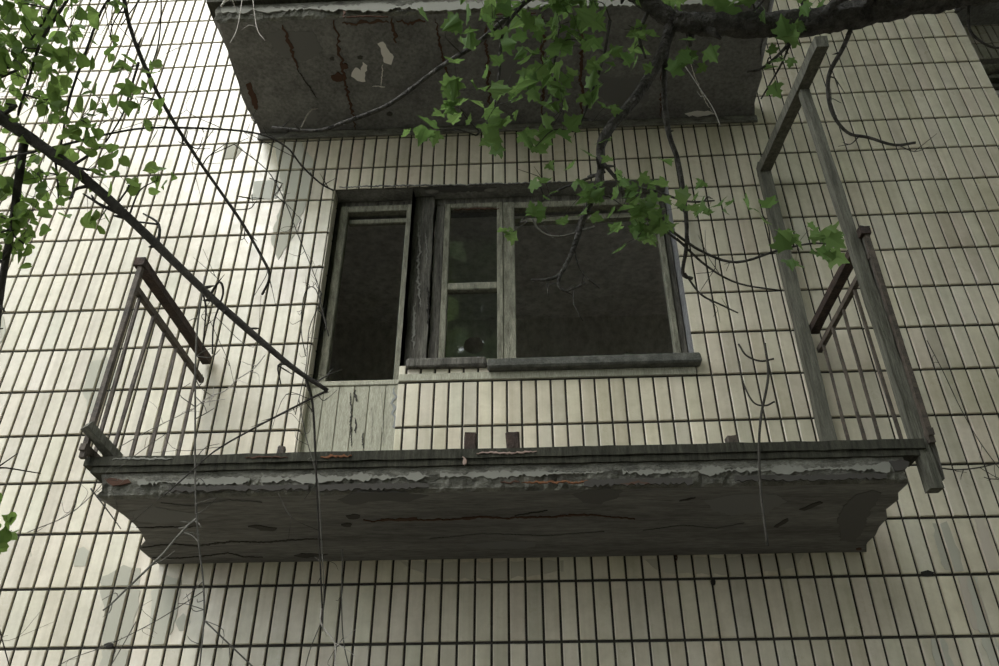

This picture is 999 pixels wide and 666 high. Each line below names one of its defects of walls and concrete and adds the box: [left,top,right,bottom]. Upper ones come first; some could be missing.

peeling [378,42,394,65]
peeling [351,55,367,82]
crack [363,497,744,539]